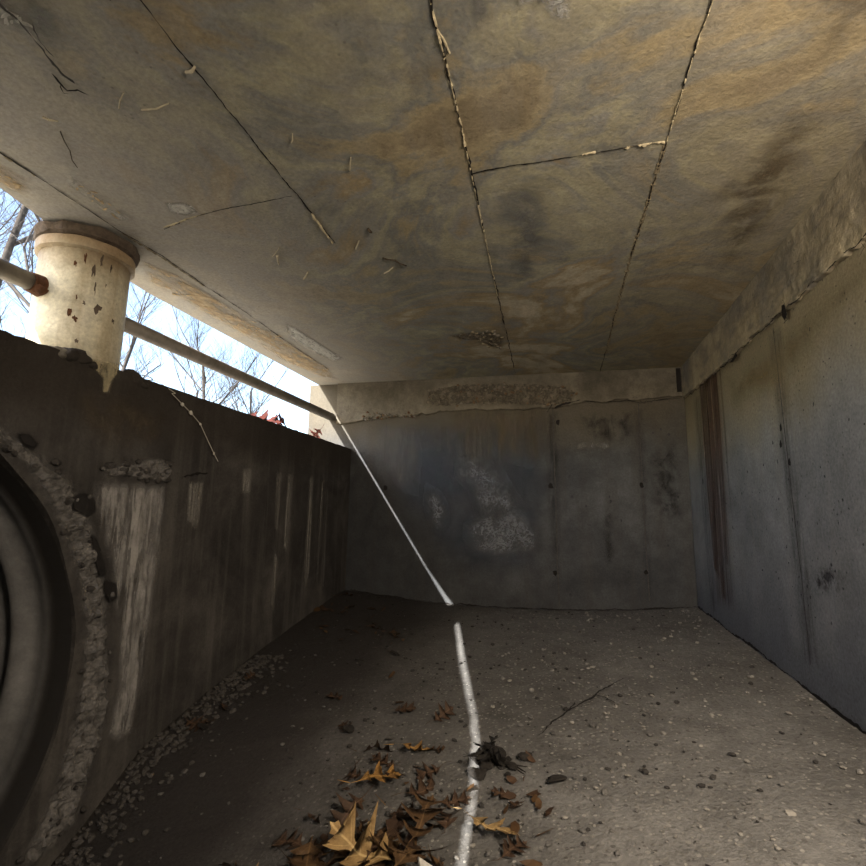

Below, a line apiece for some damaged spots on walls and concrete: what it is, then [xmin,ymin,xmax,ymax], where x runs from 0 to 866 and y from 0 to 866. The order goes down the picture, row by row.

crack [32,24,86,94]
rust [74,253,112,293]
crack [547,233,866,412]
leakage [468,459,535,553]
rust [700,374,729,602]
spalling [0,429,175,866]